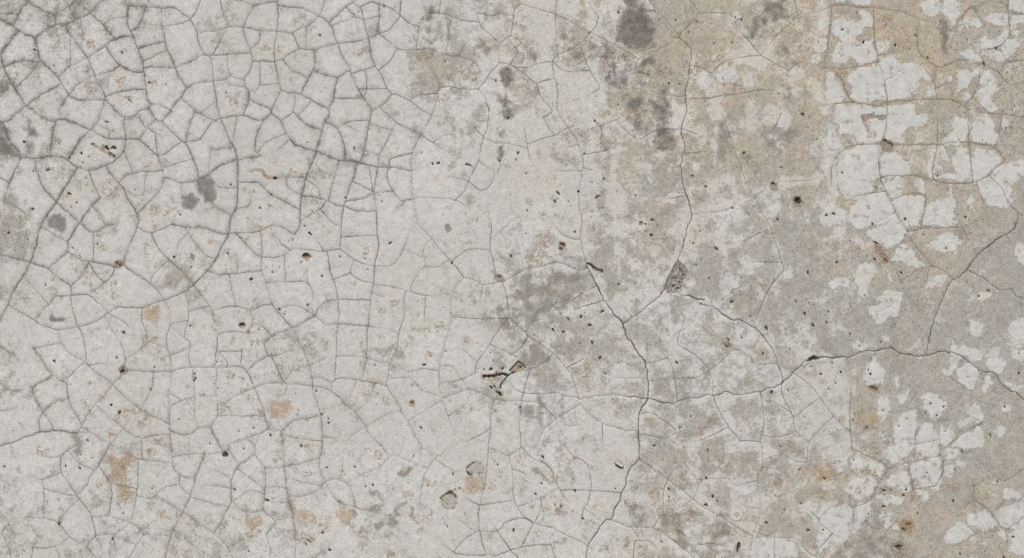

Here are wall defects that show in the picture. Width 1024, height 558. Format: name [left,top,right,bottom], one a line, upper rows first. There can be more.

water stain [617,0,655,48]
crack [0,0,798,390]
crack [820,0,1024,398]
crack [430,123,889,557]
spalling [645,261,687,321]
peeling [680,0,1024,558]
crack [3,404,99,445]
crack [31,371,238,555]
crack [286,350,381,458]
crack [901,436,945,491]
crack [962,470,1024,544]